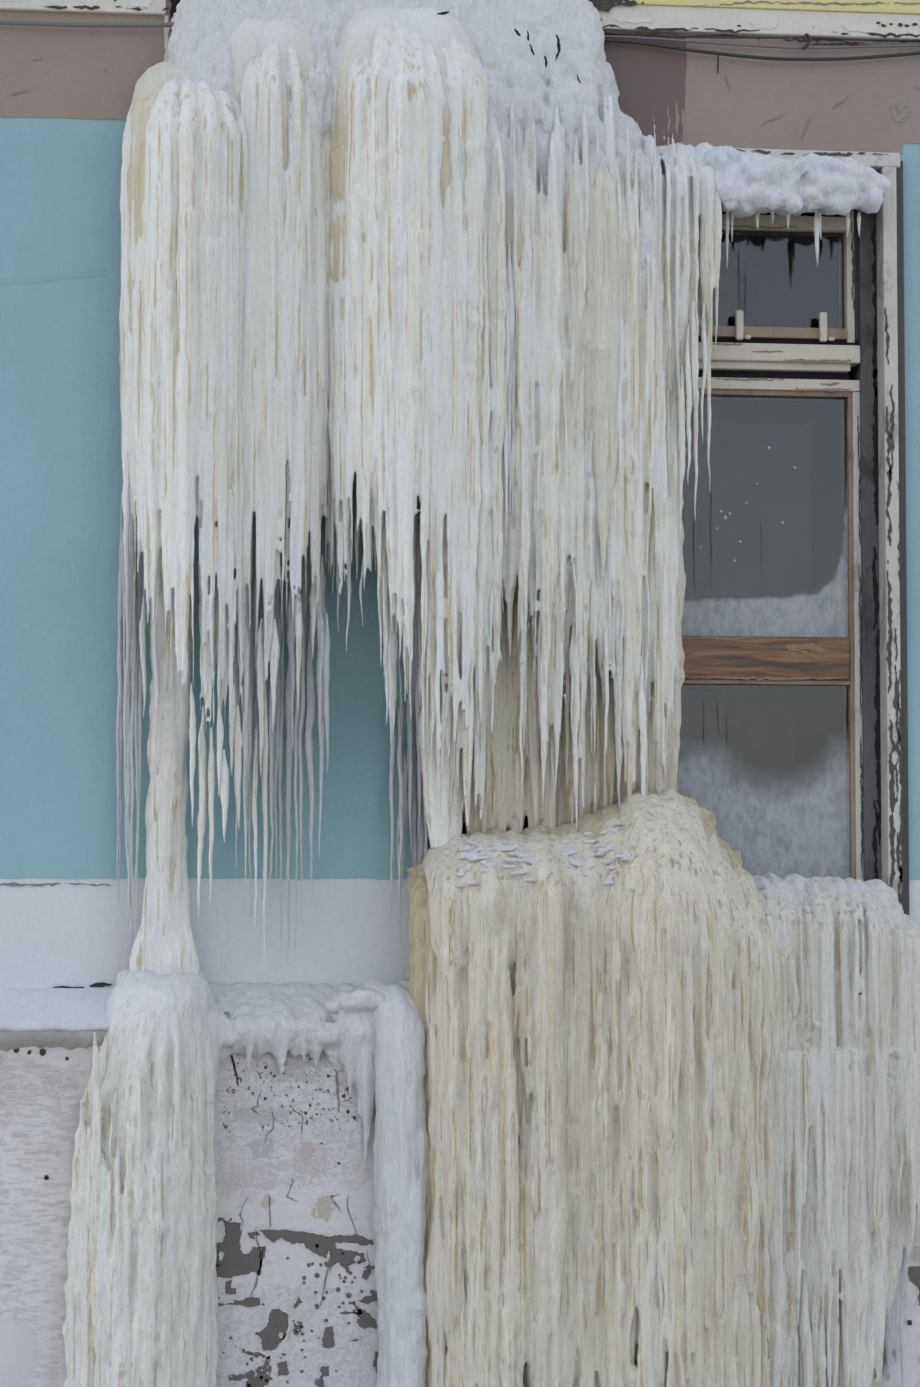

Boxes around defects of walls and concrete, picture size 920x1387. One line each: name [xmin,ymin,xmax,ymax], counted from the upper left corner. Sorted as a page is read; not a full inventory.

peeling [588,0,759,33]
peeling [836,21,920,38]
peeling [216,1217,379,1387]
peeling [907,1264,920,1326]